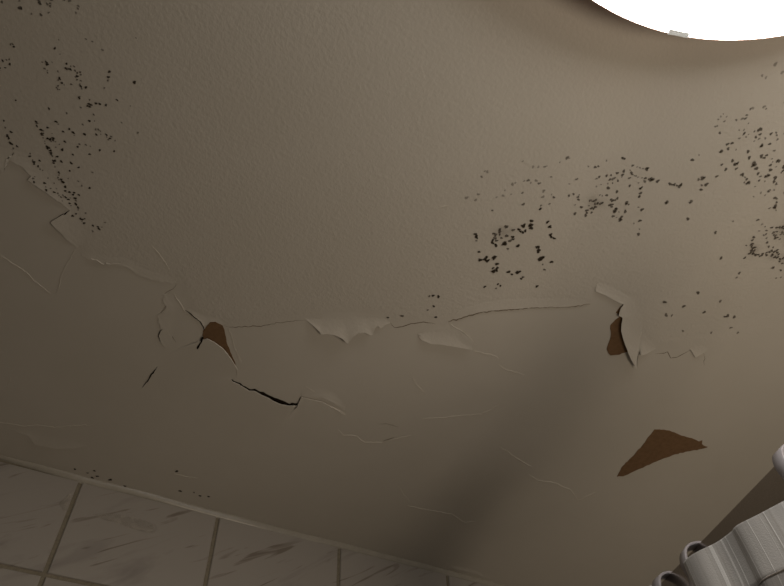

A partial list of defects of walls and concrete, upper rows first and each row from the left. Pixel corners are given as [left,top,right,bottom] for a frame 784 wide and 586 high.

peeling [0,146,84,293]
mould [28,61,112,232]
mould [478,220,534,280]
mould [568,157,682,222]
mould [698,128,784,211]
mould [743,219,784,279]
spalling [185,308,242,365]
peeling [305,312,390,343]
peeling [595,283,657,368]
crack [232,380,301,406]
spalling [617,429,707,477]